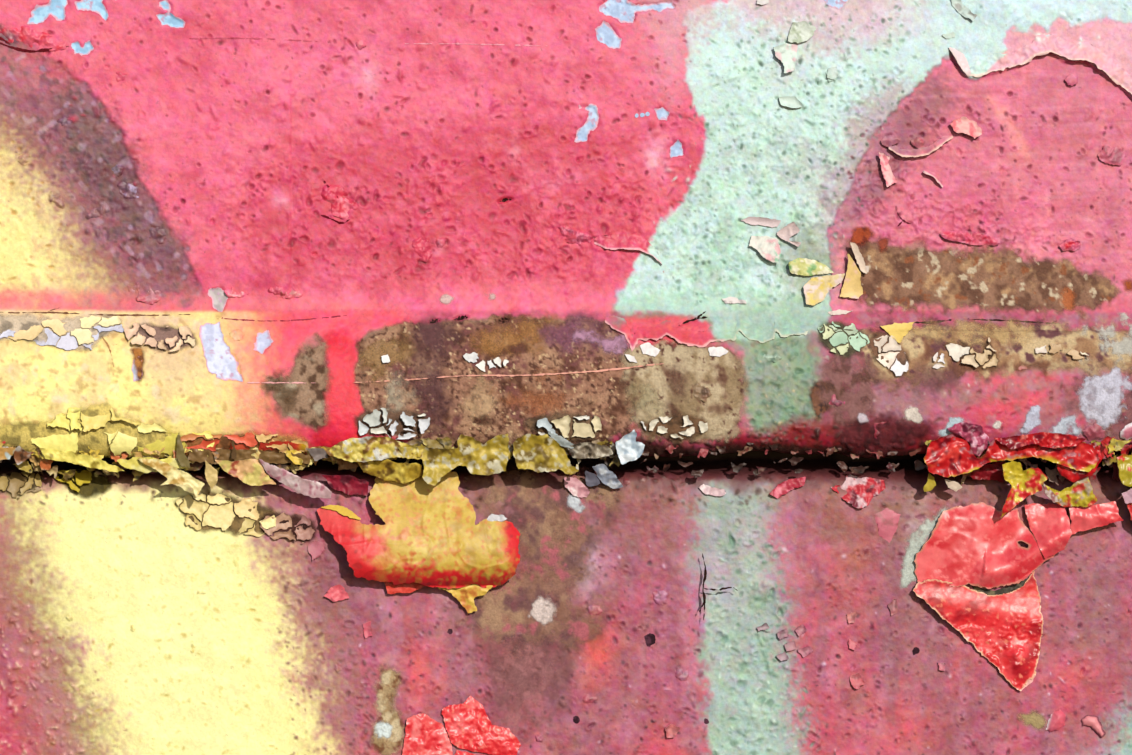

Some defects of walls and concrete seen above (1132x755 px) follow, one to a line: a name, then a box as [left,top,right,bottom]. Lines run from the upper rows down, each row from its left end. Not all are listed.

peeling [27,0,109,24]
peeling [156,0,185,28]
peeling [595,0,675,49]
peeling [942,32,1132,95]
peeling [574,104,599,143]
peeling [878,116,982,187]
peeling [605,217,914,377]
corrosion [810,227,1132,456]
corrosion [266,334,329,454]
corrosion [355,314,748,450]
peeling [0,404,1132,691]
peeling [402,695,521,755]